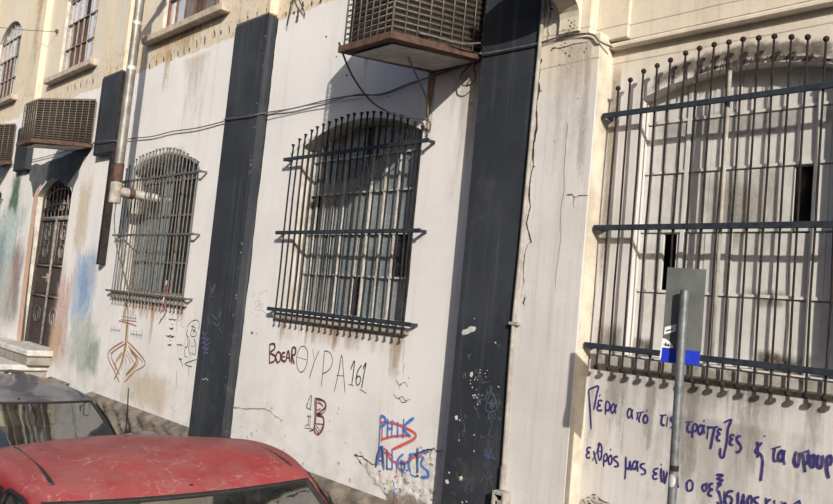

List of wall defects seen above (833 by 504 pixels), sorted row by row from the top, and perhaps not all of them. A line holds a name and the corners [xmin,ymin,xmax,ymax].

rust [425,72,436,138]
crack [521,0,589,307]
crack [233,406,283,421]
flaking render [356,448,450,504]
flaking render [579,494,610,504]